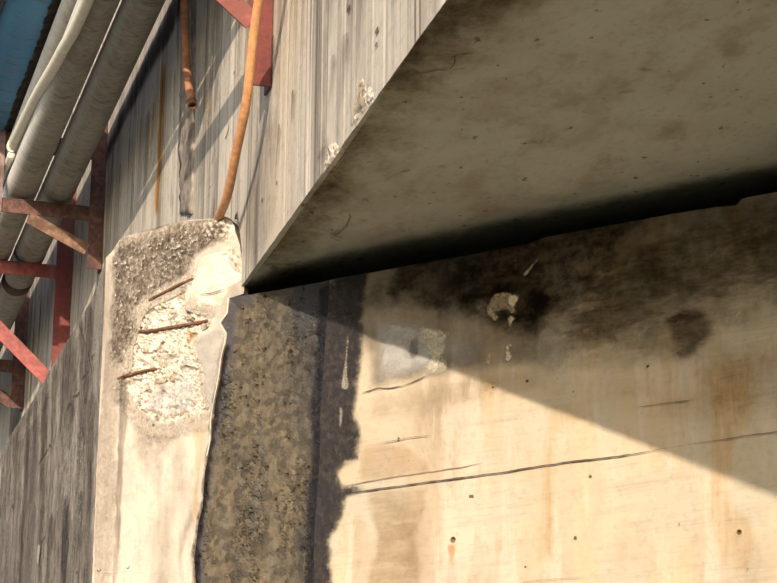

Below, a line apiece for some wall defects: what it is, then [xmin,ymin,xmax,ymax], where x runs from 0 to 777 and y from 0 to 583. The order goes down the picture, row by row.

spalling [198,219,242,275]
peeling [487,292,518,326]
spalling [113,273,229,456]
water stain [245,170,777,583]
crack [345,431,777,493]